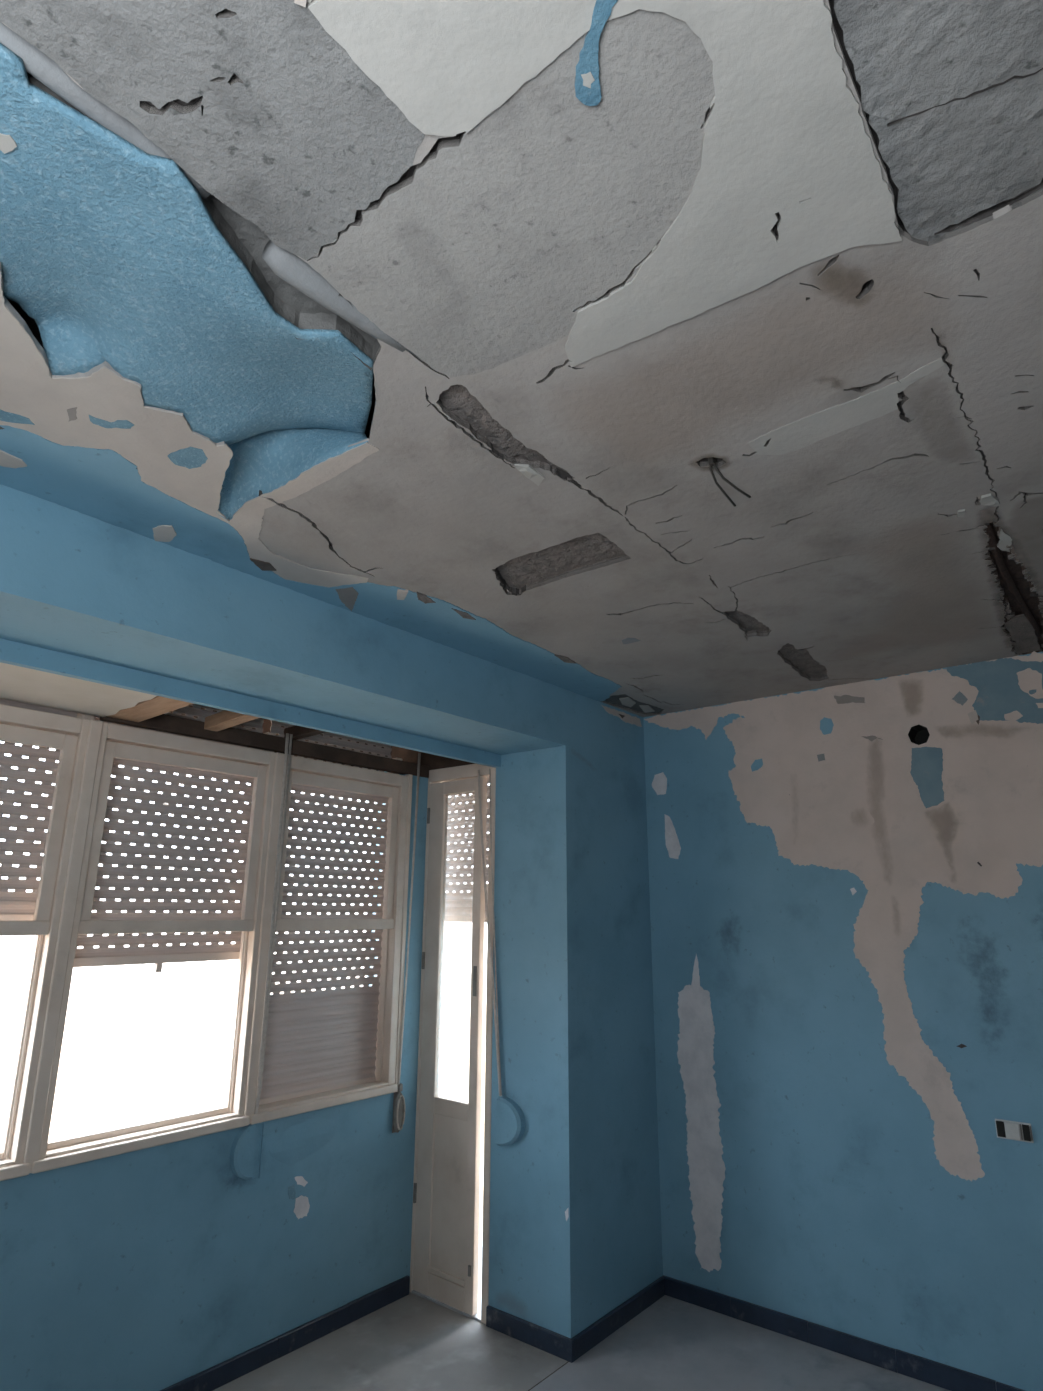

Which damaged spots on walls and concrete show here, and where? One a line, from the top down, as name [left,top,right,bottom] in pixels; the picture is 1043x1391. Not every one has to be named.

crack [308,133,464,261]
crack [574,242,659,311]
peeling [0,0,902,702]
flaking render [748,357,983,467]
crack [924,269,1040,519]
peeling [990,651,1043,708]
peeling [602,668,1043,1181]
peeling [677,955,726,1272]
peeling [288,1176,310,1219]